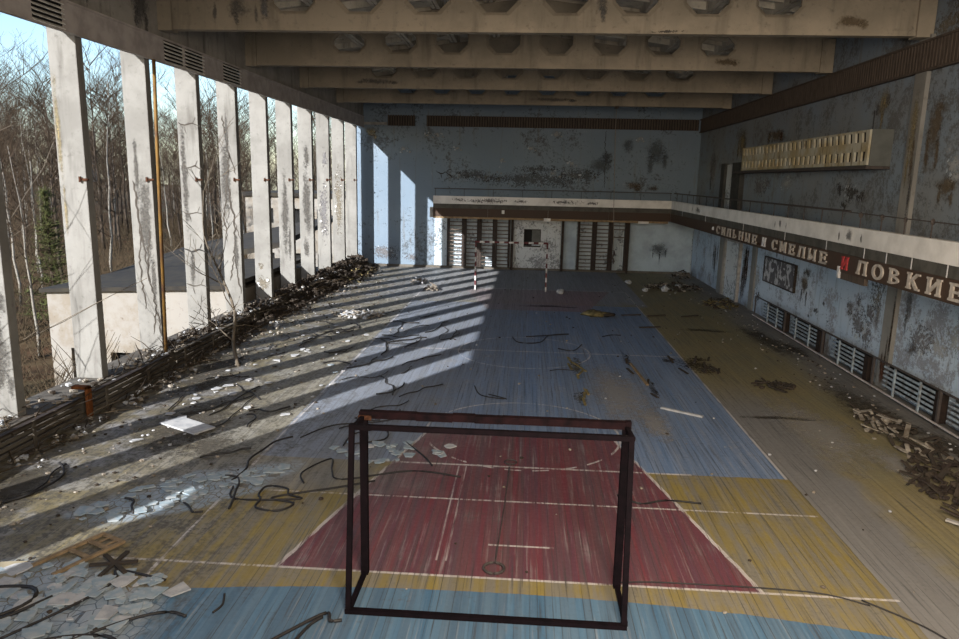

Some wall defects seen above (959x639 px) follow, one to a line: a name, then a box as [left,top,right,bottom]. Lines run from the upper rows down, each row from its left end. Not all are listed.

damp [904,95,944,205]
spalling [847,282,886,348]